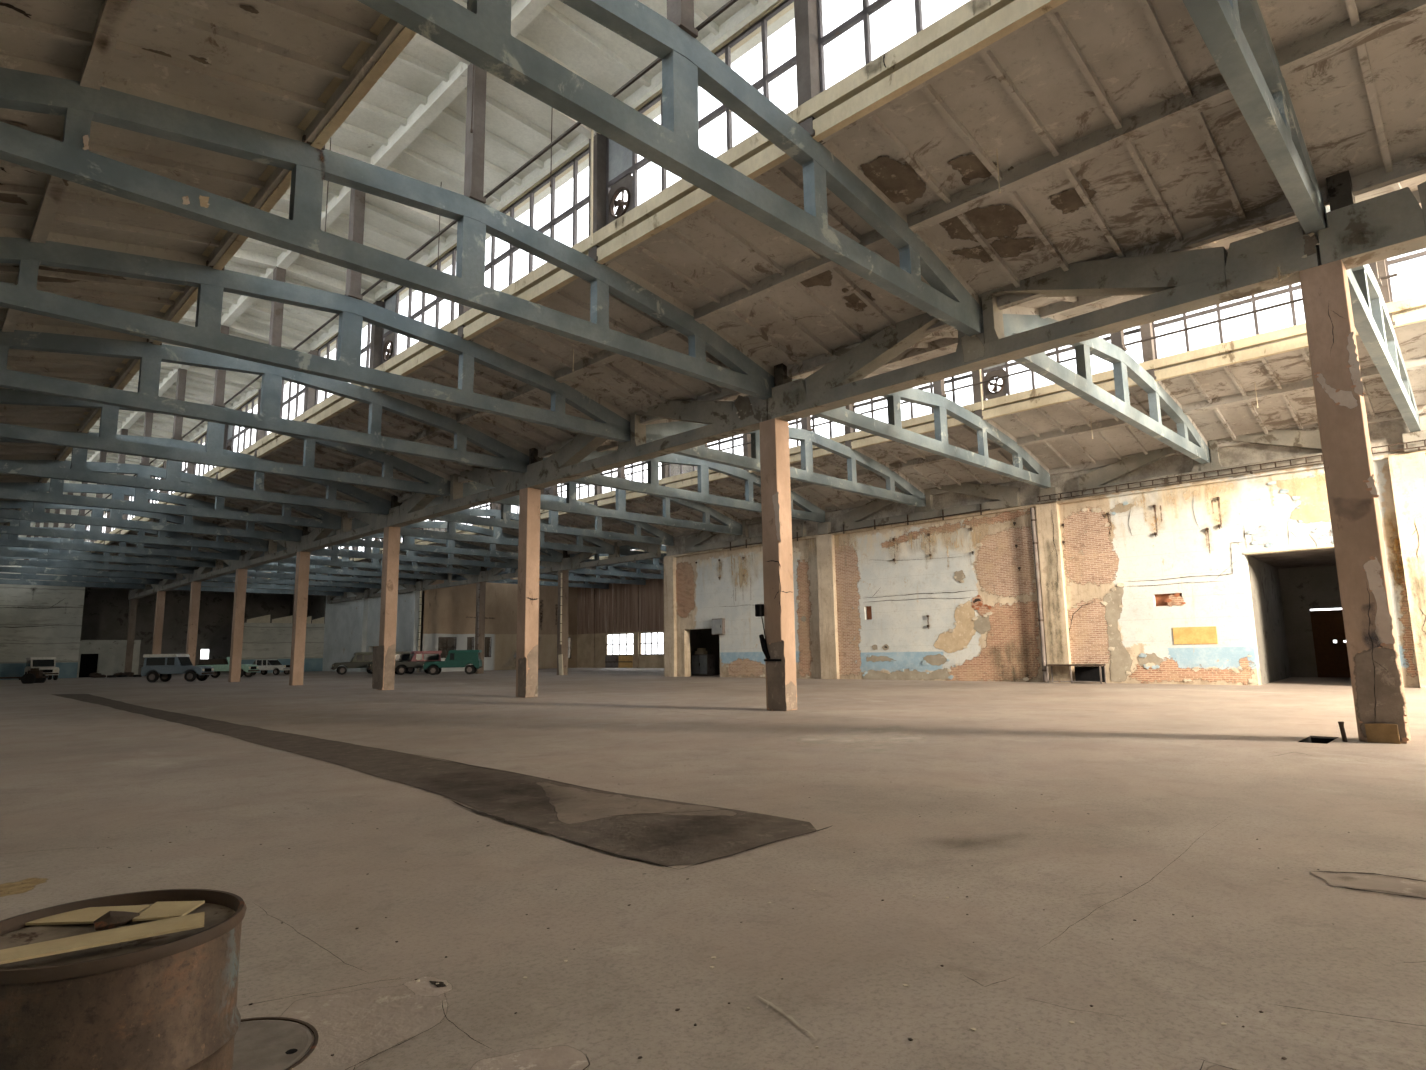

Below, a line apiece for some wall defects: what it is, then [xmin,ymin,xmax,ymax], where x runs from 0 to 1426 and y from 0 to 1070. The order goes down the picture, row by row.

peeling [860,156,926,205]
peeling [948,154,1014,185]
peeling [1048,179,1097,214]
peeling [939,204,1035,263]
peeling [1314,332,1365,409]
flaking render [834,508,1040,682]